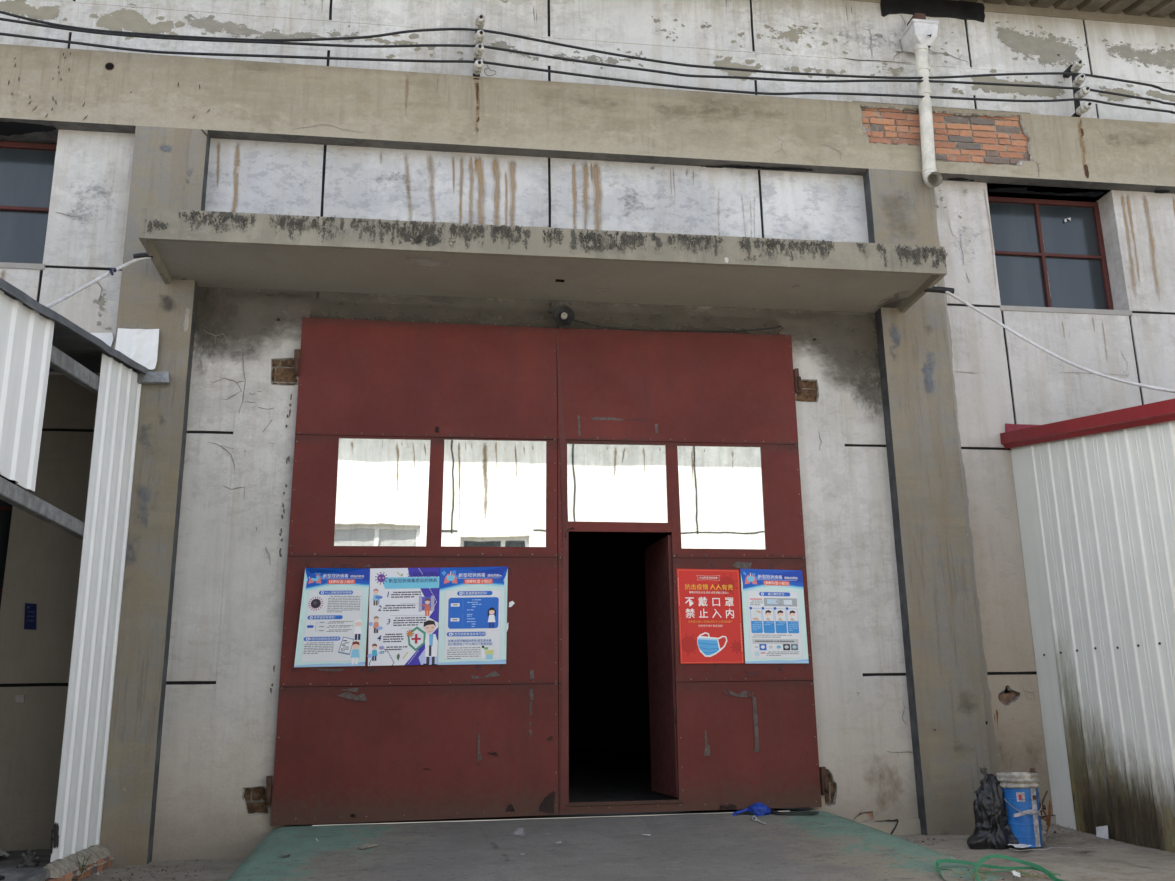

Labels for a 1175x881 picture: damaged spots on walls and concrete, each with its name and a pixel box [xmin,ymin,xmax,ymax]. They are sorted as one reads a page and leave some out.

peeling [90,3,435,59]
peeling [713,22,848,81]
peeling [995,21,1088,68]
flaking render [852,69,1065,166]
corrosion [1079,123,1089,178]
leakage [145,210,255,233]
corrosion [452,158,515,226]
leakage [271,193,722,267]
corrosion [572,165,601,230]
corrosion [1121,196,1139,286]
spalling [242,786,268,815]
leakage [1067,735,1175,853]